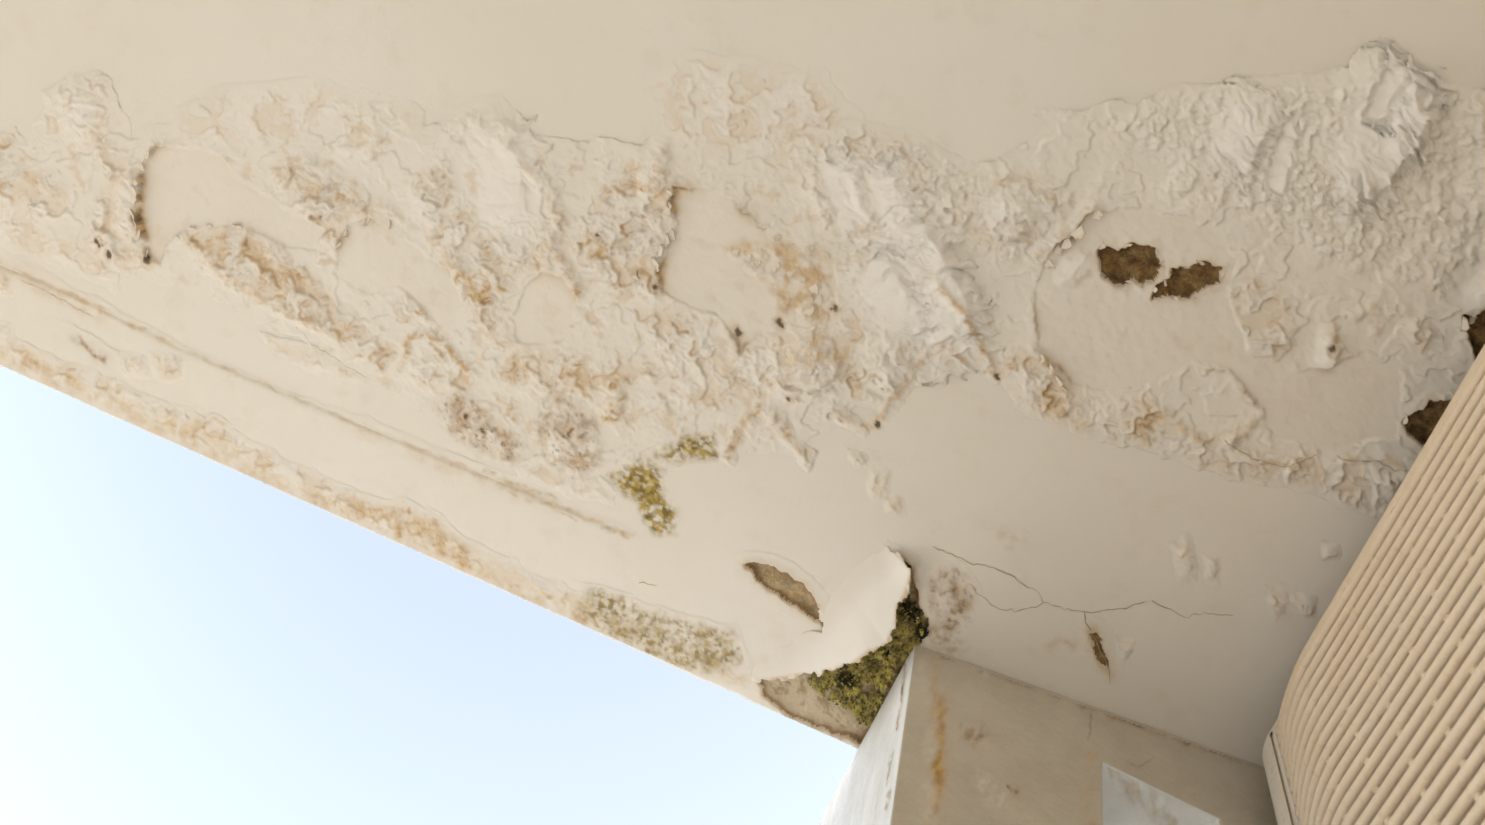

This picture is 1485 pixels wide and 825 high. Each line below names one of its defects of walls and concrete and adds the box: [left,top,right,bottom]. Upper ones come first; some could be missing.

peeling [0,123,884,474]
peeling [992,65,1485,519]
damp [577,583,749,682]
spalling [875,539,924,610]
crack [934,547,1233,683]
spalling [742,662,870,748]
peeling [861,658,910,814]